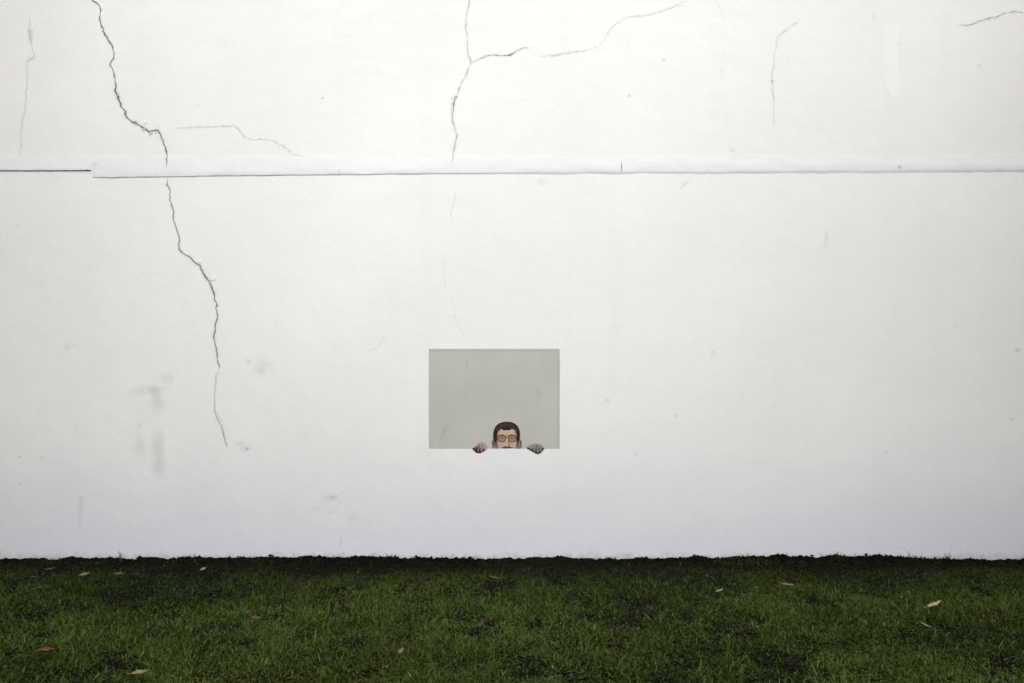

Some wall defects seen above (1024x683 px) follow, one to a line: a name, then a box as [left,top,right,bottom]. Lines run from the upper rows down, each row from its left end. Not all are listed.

crack [92,0,220,368]